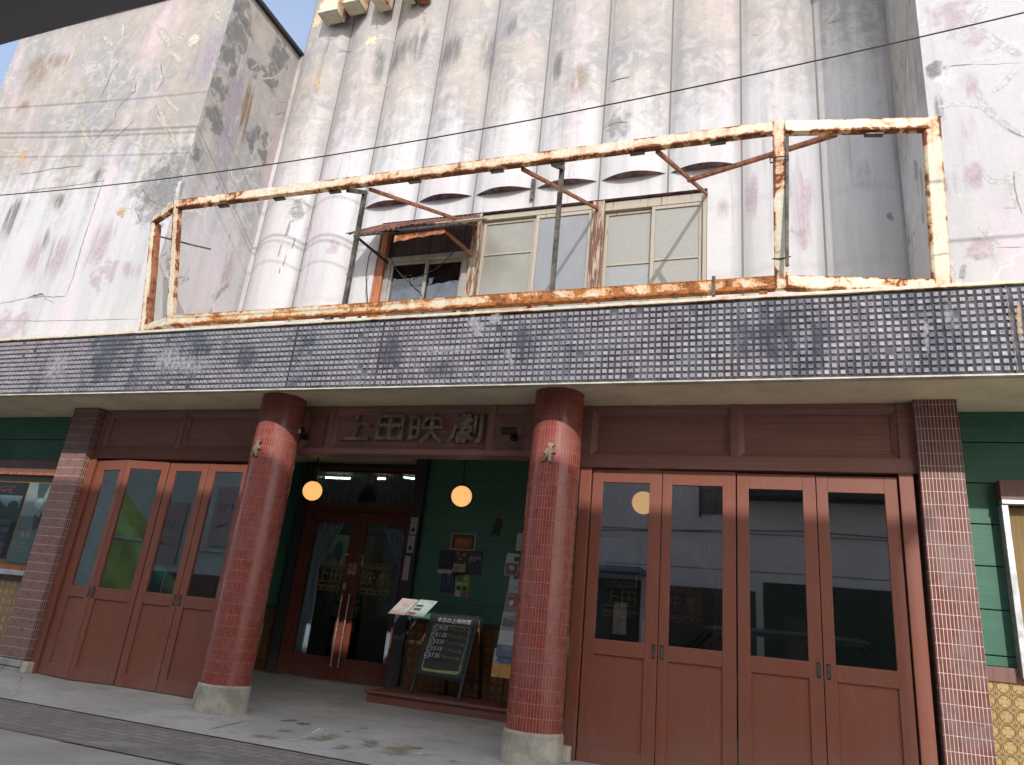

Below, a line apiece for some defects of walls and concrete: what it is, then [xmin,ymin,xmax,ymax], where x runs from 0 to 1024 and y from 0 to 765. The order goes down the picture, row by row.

crack [938,5,1024,137]
crack [2,23,188,321]
crack [984,170,1022,213]